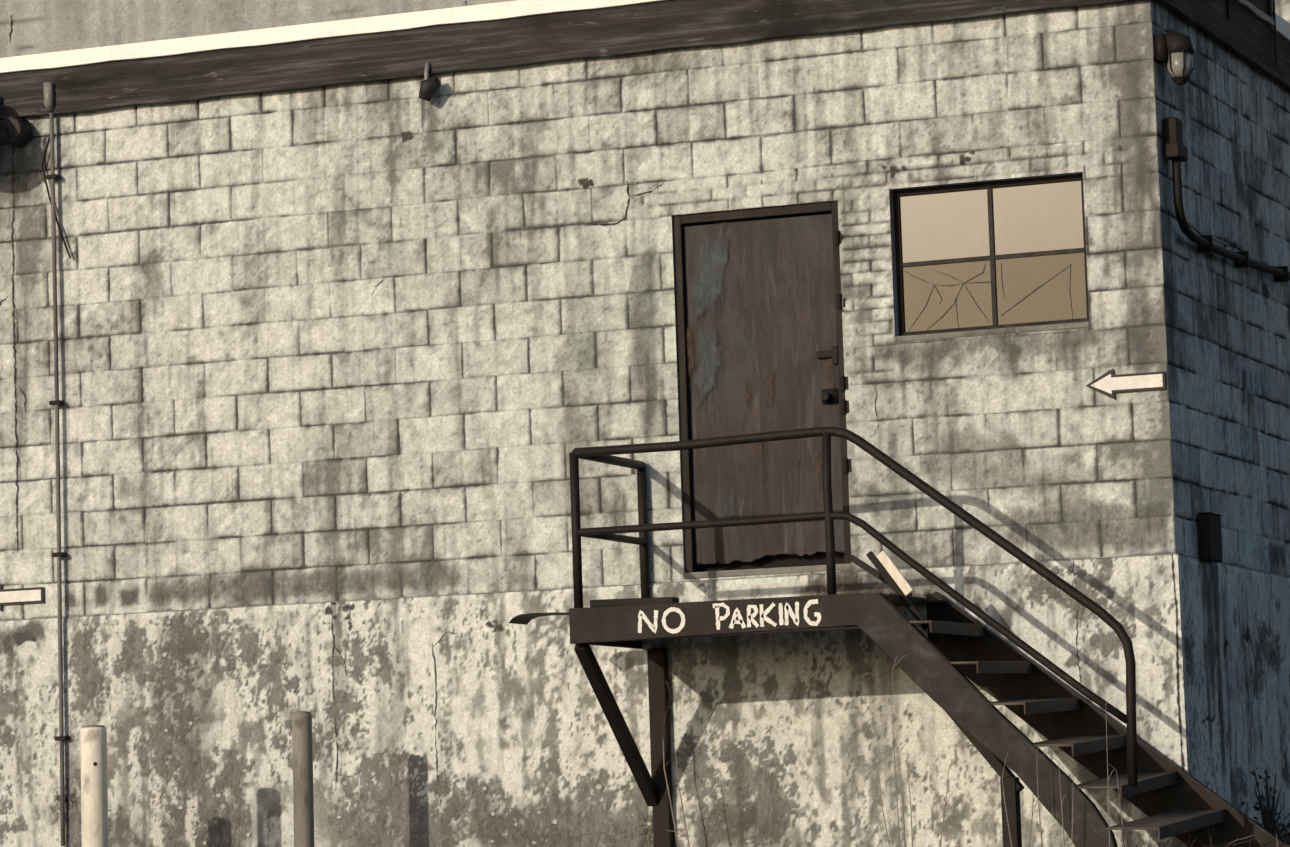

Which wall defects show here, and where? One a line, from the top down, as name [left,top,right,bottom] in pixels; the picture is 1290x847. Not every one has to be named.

crack [587,181,663,226]
peeling [1015,554,1137,668]
peeling [1179,621,1197,689]
peeling [1244,613,1283,706]
peeling [0,680,27,842]
peeling [51,769,82,847]
peeling [68,606,300,847]
peeling [310,602,653,847]